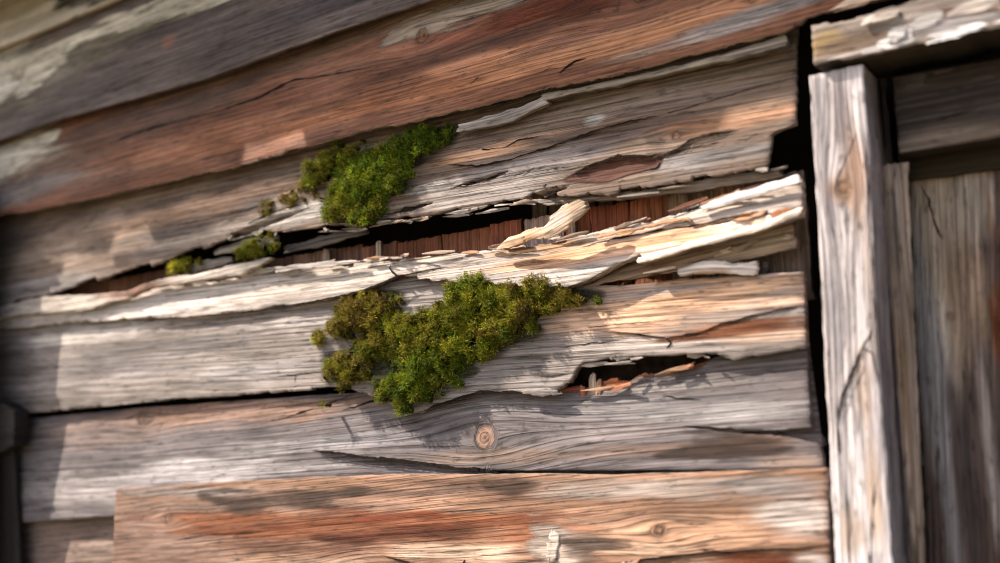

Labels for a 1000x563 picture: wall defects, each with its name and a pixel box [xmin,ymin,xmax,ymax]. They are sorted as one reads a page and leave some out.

peeling [732,207,796,225]
crack [834,133,878,453]
crack [313,450,498,474]
spalling [527,524,625,563]